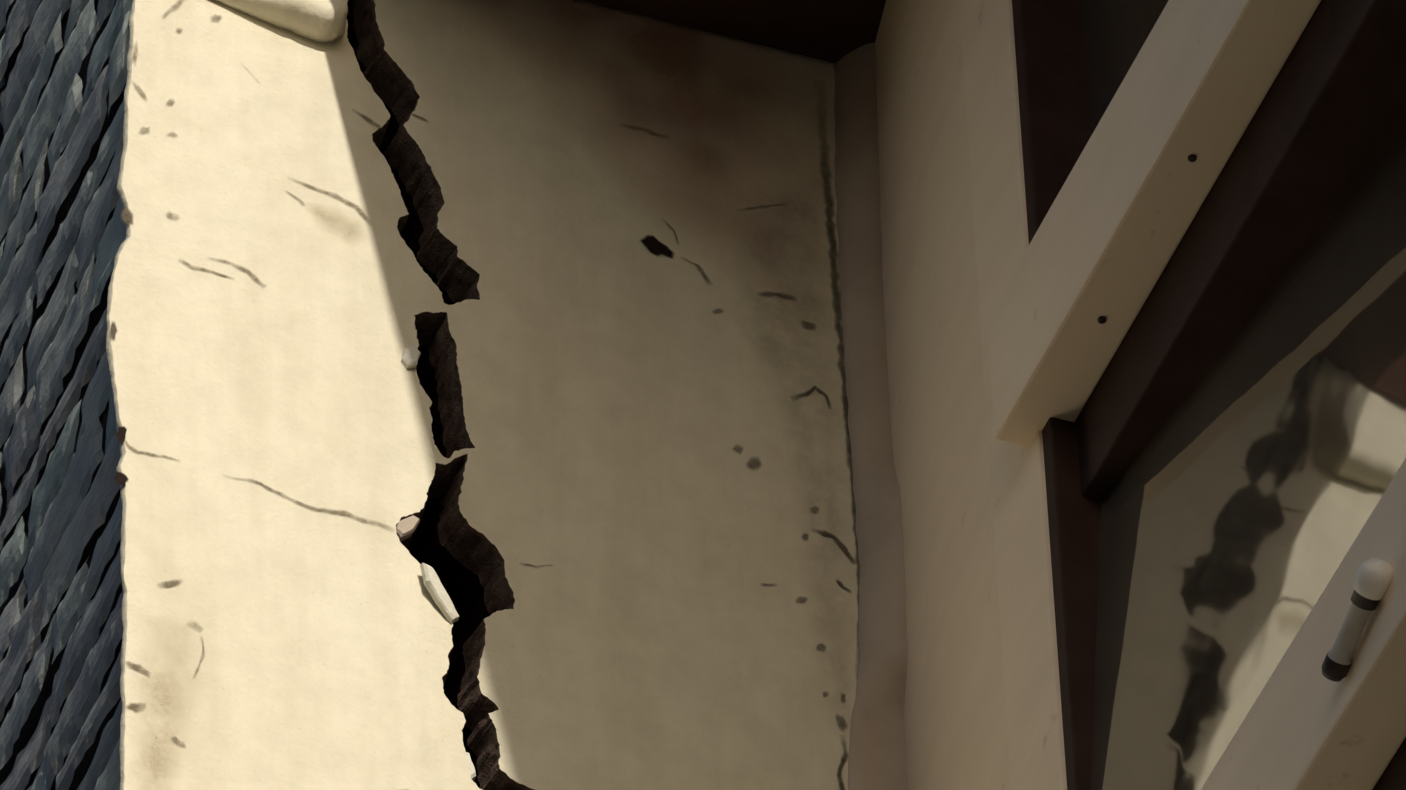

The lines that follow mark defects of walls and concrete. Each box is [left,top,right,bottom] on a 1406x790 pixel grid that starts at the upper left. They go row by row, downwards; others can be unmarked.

crack [127,444,172,459]
crack [250,0,548,790]
crack [822,153,860,604]
crack [837,749,848,790]